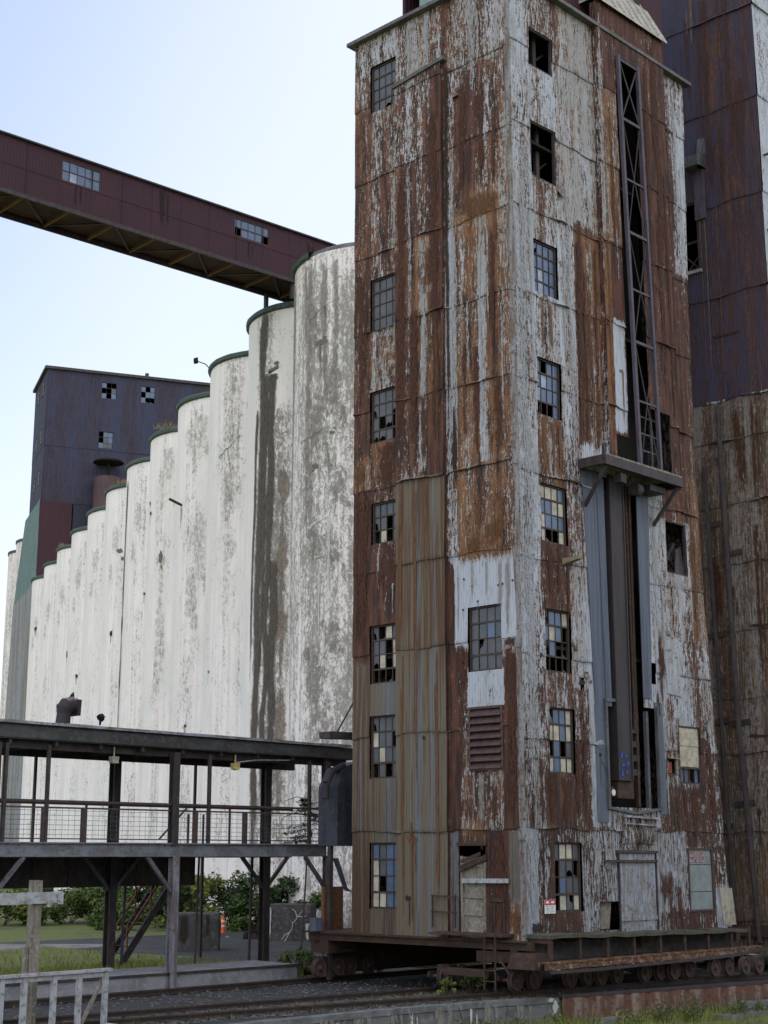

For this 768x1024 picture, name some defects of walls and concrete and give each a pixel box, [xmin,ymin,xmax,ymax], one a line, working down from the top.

damp [304,259,339,486]
peeling [406,176,427,411]
peeling [465,0,479,97]
peeling [448,161,504,542]
rust [457,83,501,346]
rust [576,108,625,451]
peeling [598,14,617,225]
damp [116,483,128,632]
damp [249,313,278,739]
rust [354,112,440,925]
damp [250,769,261,844]
rust [465,653,521,935]